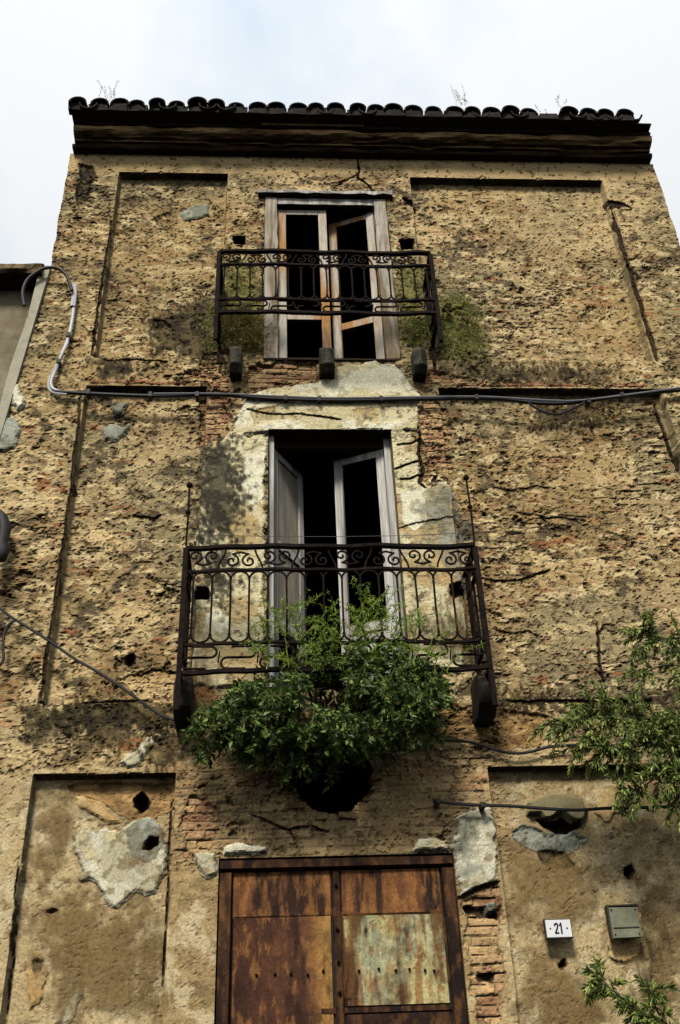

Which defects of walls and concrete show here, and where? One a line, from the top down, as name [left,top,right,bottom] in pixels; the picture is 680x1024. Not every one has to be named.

crack [333,160,373,191]
damp [181,432,258,621]
crack [251,409,339,420]
flaking render [190,349,503,691]
crack [394,429,425,488]
flaking render [67,735,268,907]
spalling [412,807,508,1024]
spalling [512,818,588,867]